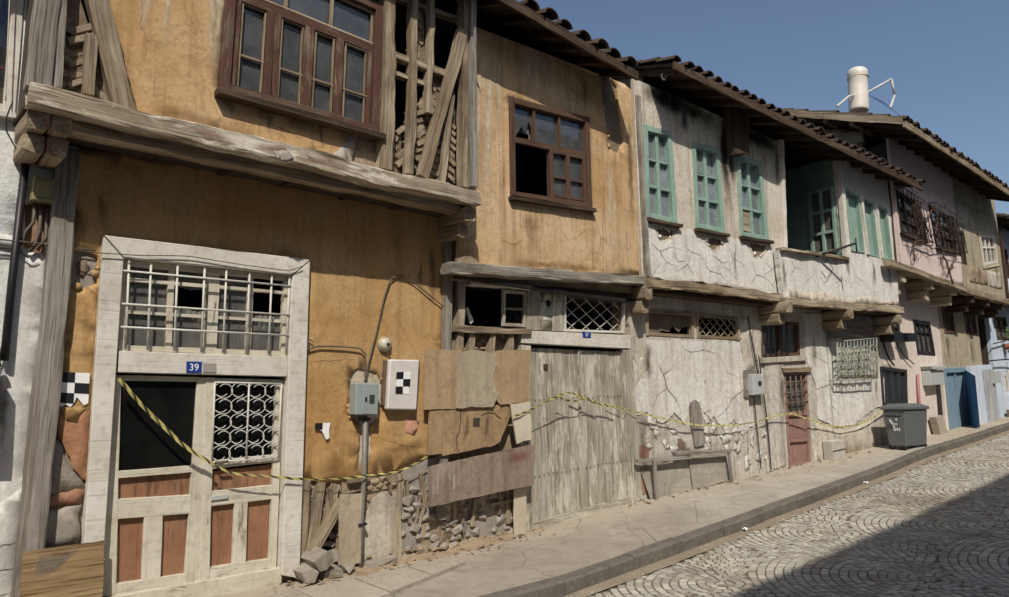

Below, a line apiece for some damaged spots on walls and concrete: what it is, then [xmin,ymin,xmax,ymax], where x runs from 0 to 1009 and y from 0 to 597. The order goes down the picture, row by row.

spalling [601,77,624,152]
spalling [70,251,100,291]
spalling [657,227,674,240]
spalling [705,236,724,250]
crack [652,243,818,287]
spalling [750,243,765,257]
crack [654,350,744,430]
peeling [45,405,91,549]
spalling [420,519,458,552]